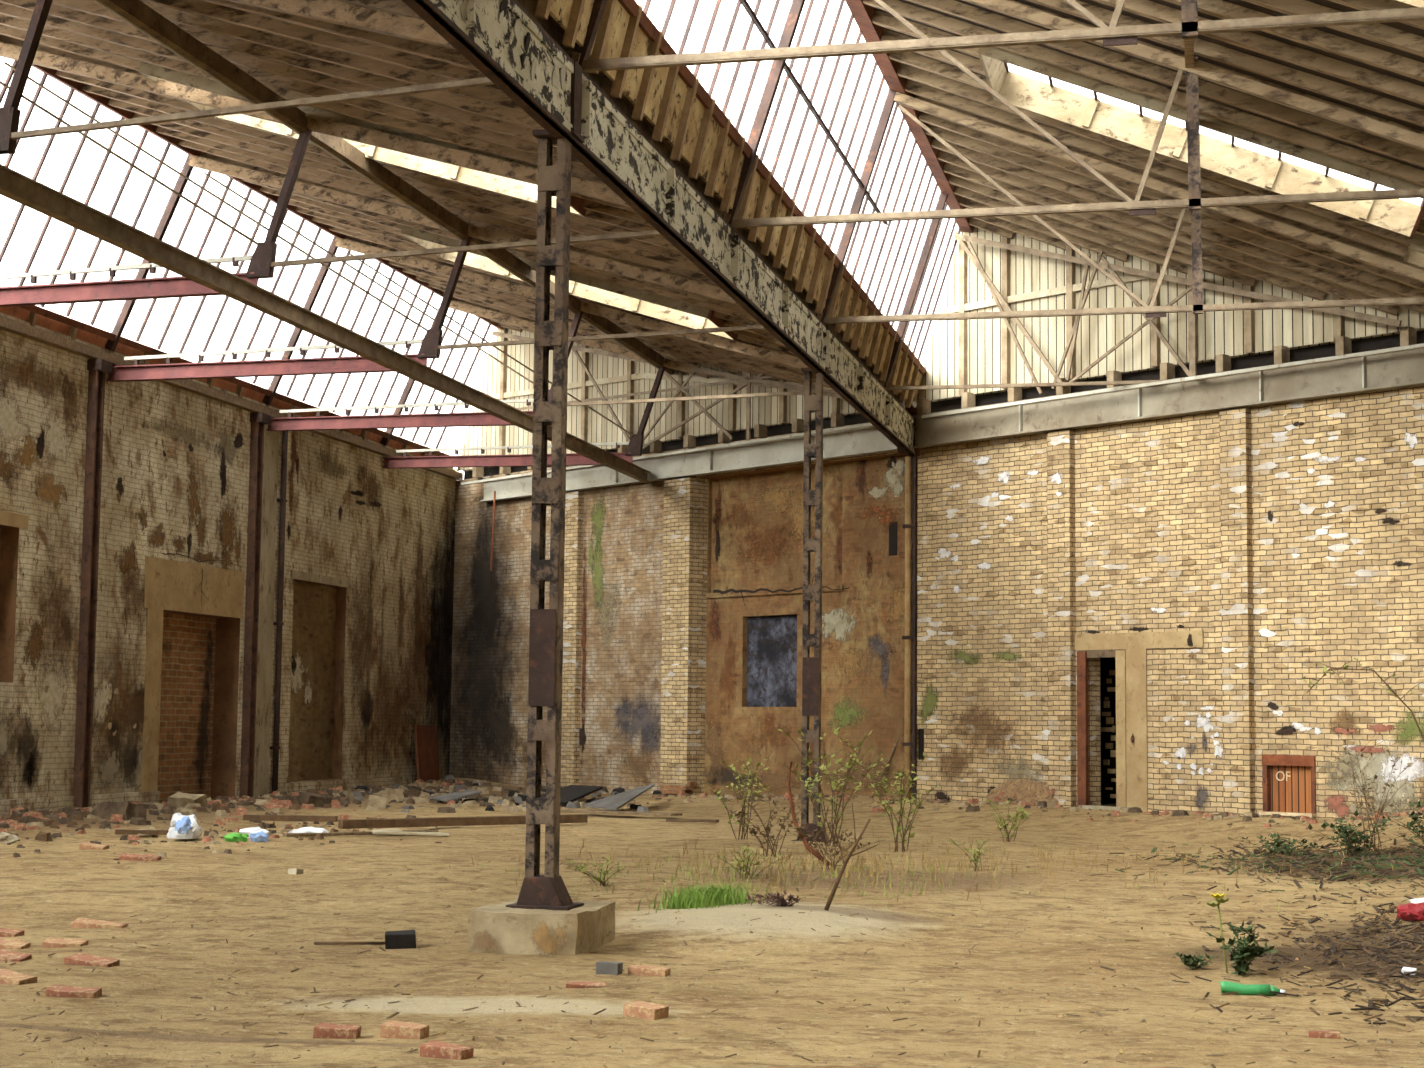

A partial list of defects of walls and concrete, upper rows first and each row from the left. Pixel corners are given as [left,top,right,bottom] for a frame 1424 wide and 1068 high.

peeling [498,0,567,91]
peeling [0,397,69,507]
peeling [120,433,244,576]
corrosion [714,482,722,562]
corrosion [832,460,902,573]
spalling [1375,509,1400,524]
water stain [333,505,455,777]
water stain [579,532,619,764]
corrosion [708,601,735,707]
water stain [91,653,144,783]
water stain [488,697,547,775]
peeling [1163,706,1223,809]